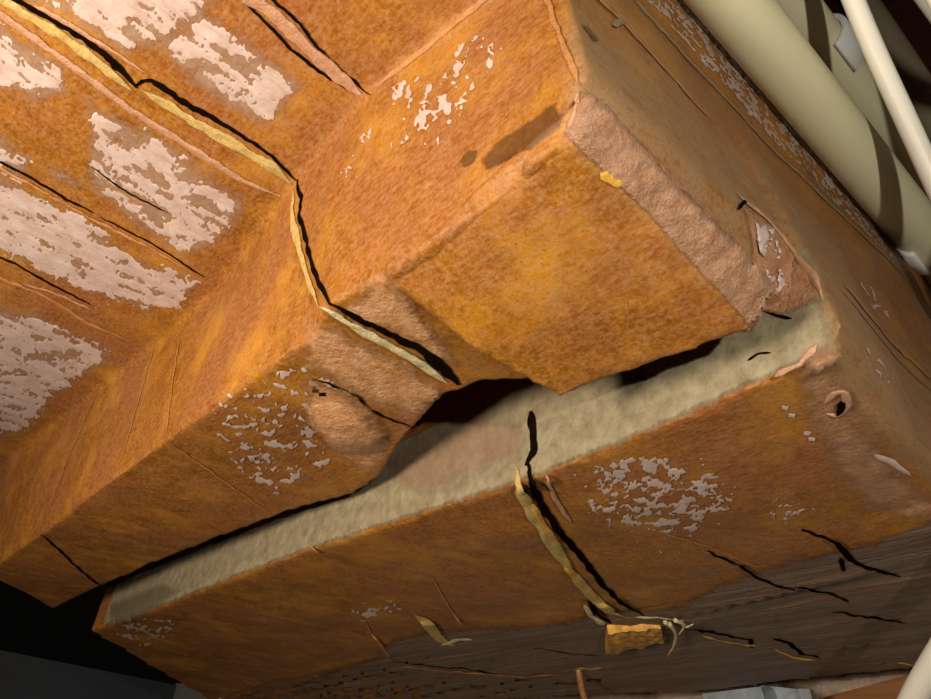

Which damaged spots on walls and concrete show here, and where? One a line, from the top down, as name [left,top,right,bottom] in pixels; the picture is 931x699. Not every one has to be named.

crack [0,0,460,385]
peeling [565,91,824,331]
crack [515,410,820,661]
crack [708,551,906,624]
crack [801,529,900,577]